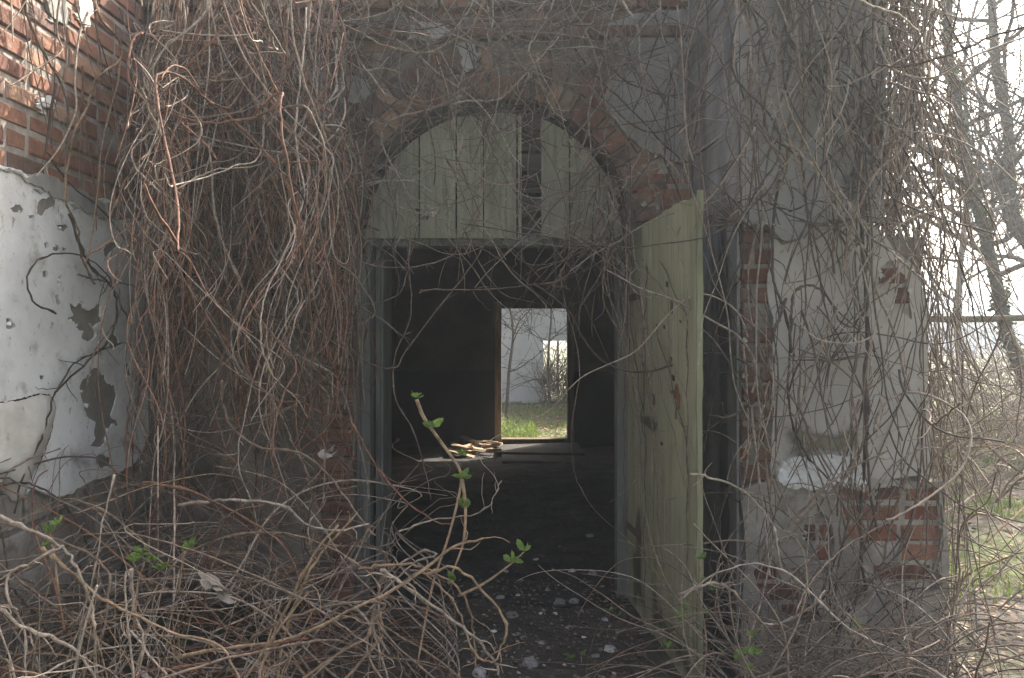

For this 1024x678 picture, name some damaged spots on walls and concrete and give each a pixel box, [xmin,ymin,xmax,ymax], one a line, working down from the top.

peeling [55,277,101,342]
spalling [877,261,914,319]
peeling [79,368,117,468]
spalling [819,486,942,595]